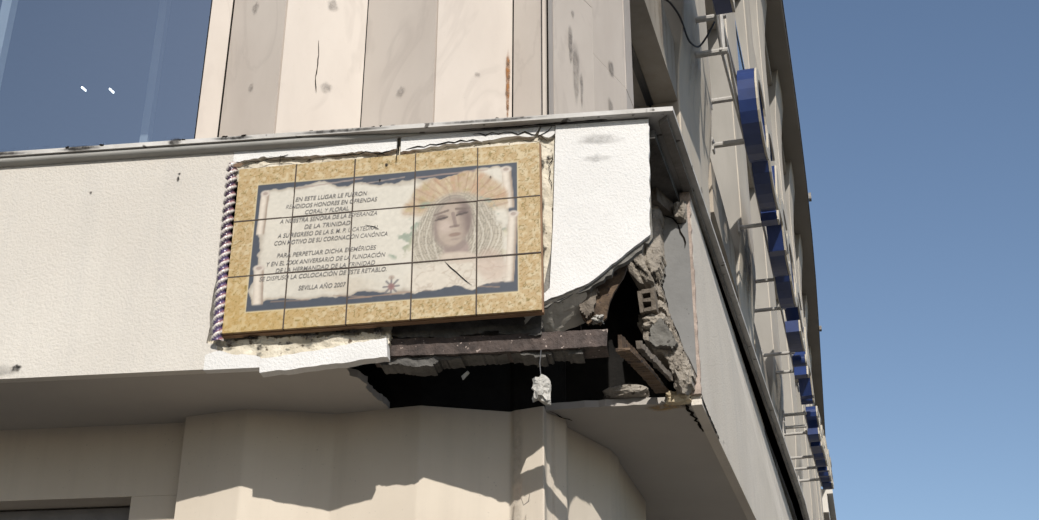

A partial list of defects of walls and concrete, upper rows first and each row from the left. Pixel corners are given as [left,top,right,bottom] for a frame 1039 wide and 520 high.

spalling [203,119,702,405]